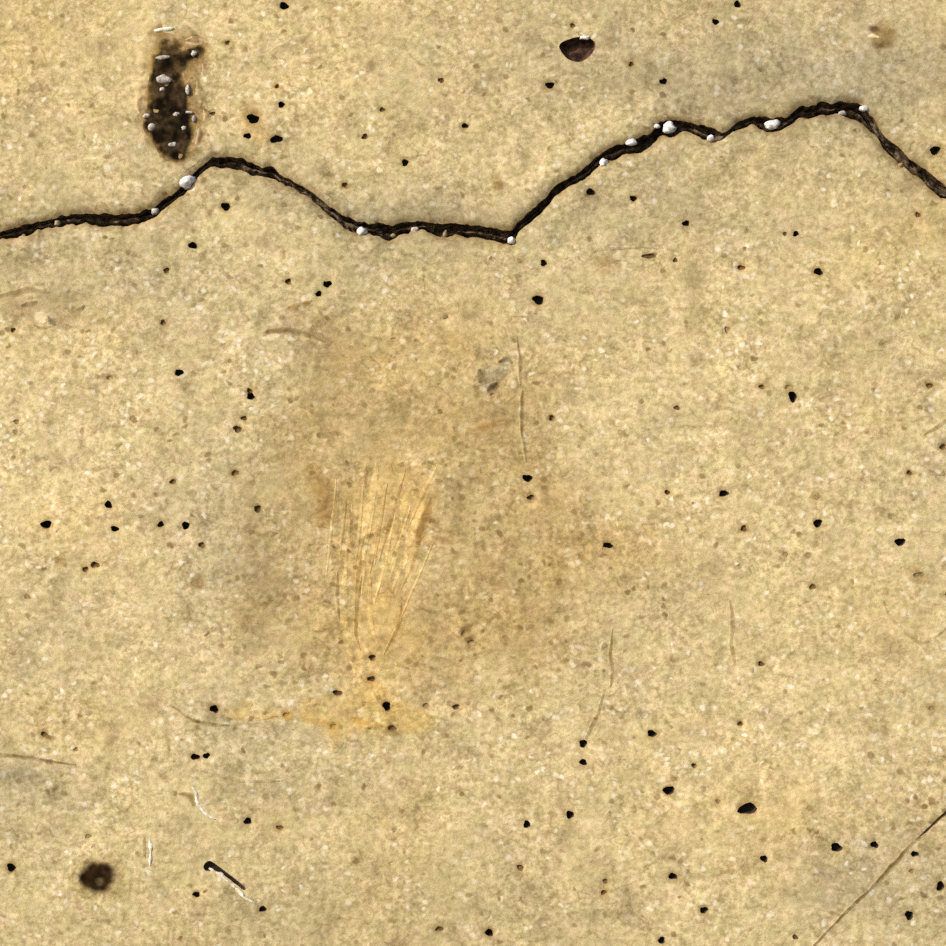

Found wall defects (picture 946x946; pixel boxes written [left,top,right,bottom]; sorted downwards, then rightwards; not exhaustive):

crack [0,101,946,245]
crack [588,245,658,266]